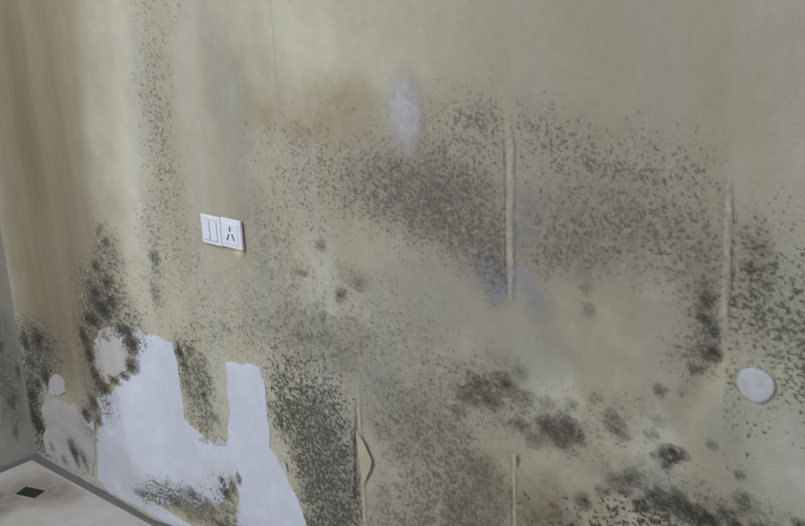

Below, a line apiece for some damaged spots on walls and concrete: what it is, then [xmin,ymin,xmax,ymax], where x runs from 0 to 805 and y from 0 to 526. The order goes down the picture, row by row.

peeling [41,327,307,526]
leakage [0,0,448,526]
leakage [270,97,805,526]